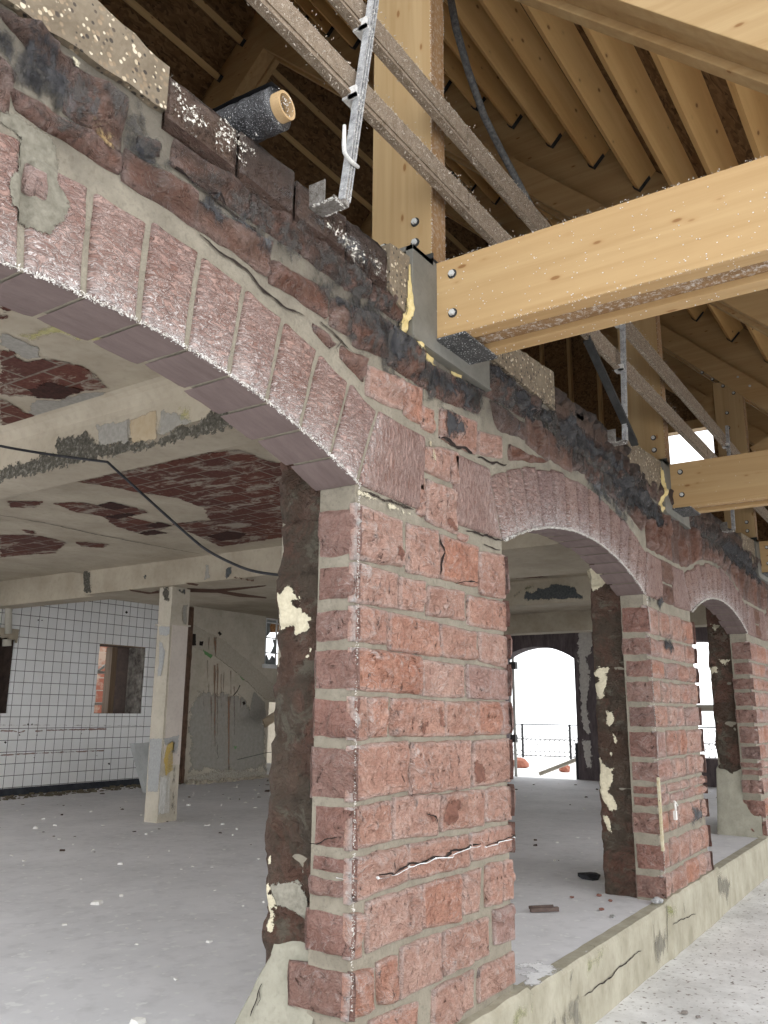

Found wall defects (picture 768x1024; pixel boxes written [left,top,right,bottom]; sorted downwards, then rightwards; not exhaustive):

crack [200,234,357,354]
spalling [0,350,107,425]
spalling [8,450,283,547]
spalling [0,529,109,558]
peeling [187,565,311,635]
crack [439,533,477,584]
peeling [587,568,605,591]
peeling [577,632,617,832]
crack [376,836,515,879]
crack [585,903,695,996]